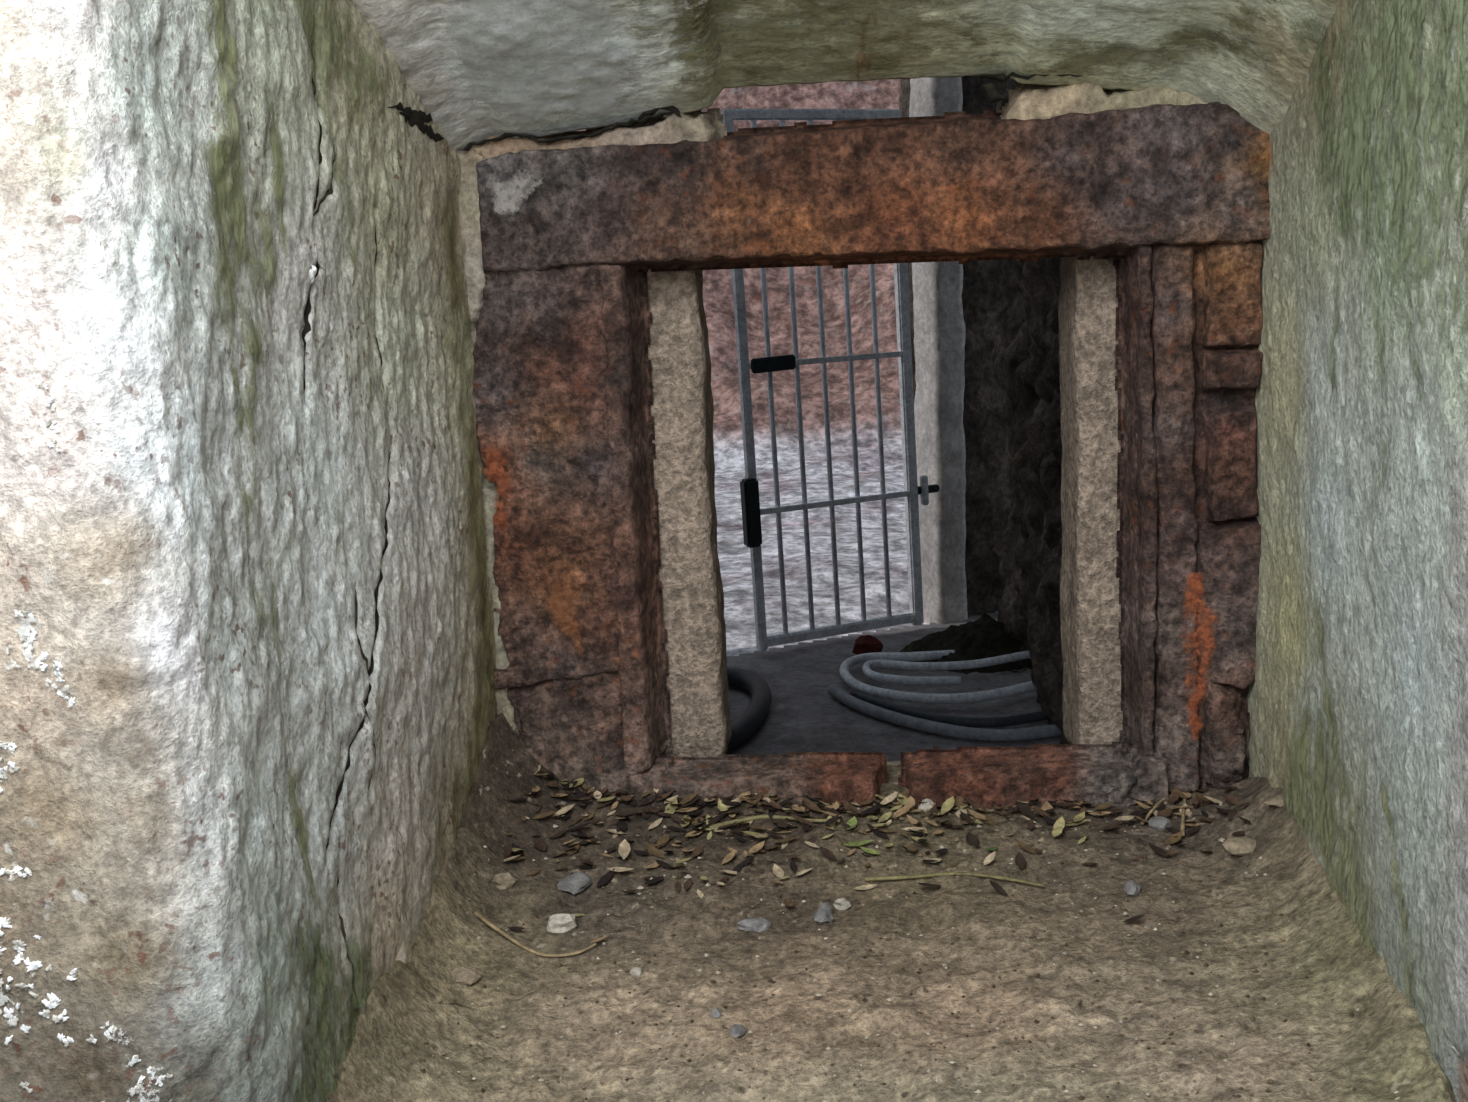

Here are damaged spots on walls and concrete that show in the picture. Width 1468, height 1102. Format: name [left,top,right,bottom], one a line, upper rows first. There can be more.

damp [665,0,718,88]
damp [206,0,245,262]
damp [265,88,286,249]
damp [239,464,249,535]
corrosion [484,446,509,525]
crack [326,452,391,985]
corrosion [1182,573,1216,739]